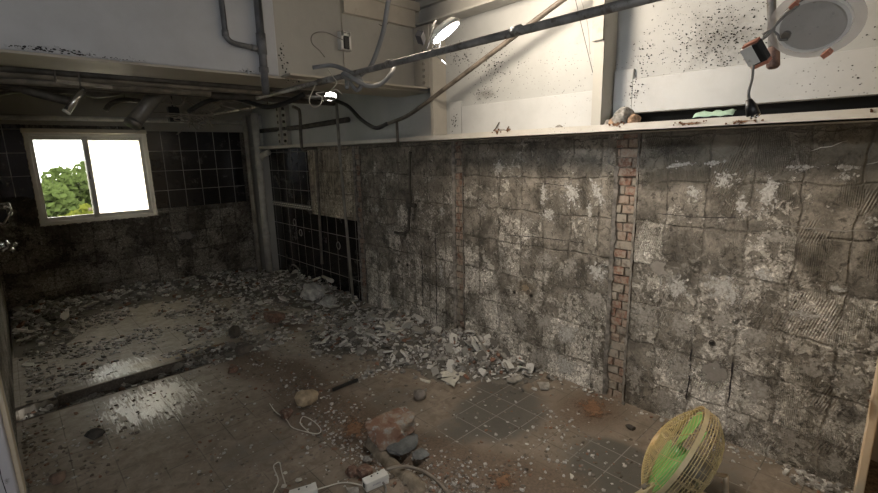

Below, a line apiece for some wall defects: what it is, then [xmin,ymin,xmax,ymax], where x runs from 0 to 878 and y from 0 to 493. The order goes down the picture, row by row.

damp [624,0,767,107]
peeling [666,159,782,217]
peeling [786,163,861,184]
spalling [352,146,382,308]
spalling [439,141,466,330]
spalling [533,133,695,402]
peeling [650,260,746,308]
crack [685,349,693,399]
crack [726,362,734,403]